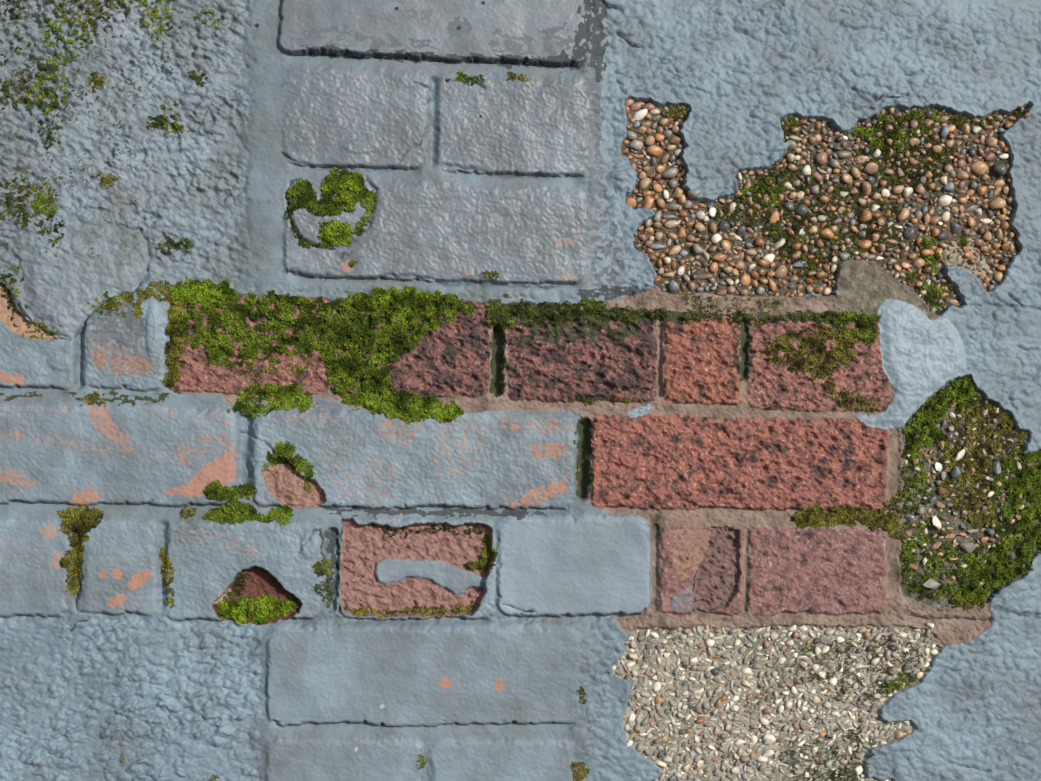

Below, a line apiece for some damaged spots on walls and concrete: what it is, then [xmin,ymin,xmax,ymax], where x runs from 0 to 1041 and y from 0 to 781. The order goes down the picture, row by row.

peeling [0,285,895,509]
peeling [0,520,64,572]
peeling [98,568,152,609]
spalling [177,528,302,626]
spalling [339,518,495,618]
peeling [605,428,993,646]